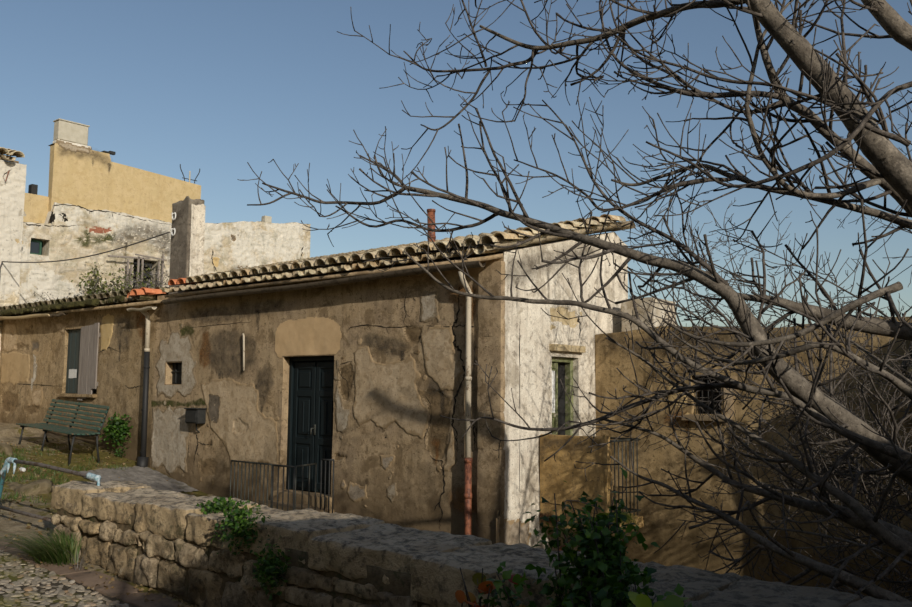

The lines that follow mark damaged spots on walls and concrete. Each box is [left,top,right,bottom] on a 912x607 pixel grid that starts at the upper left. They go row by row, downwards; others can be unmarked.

damp [117,311,148,349]
peeling [334,290,464,472]
crack [349,290,475,529]
rust [464,458,472,535]